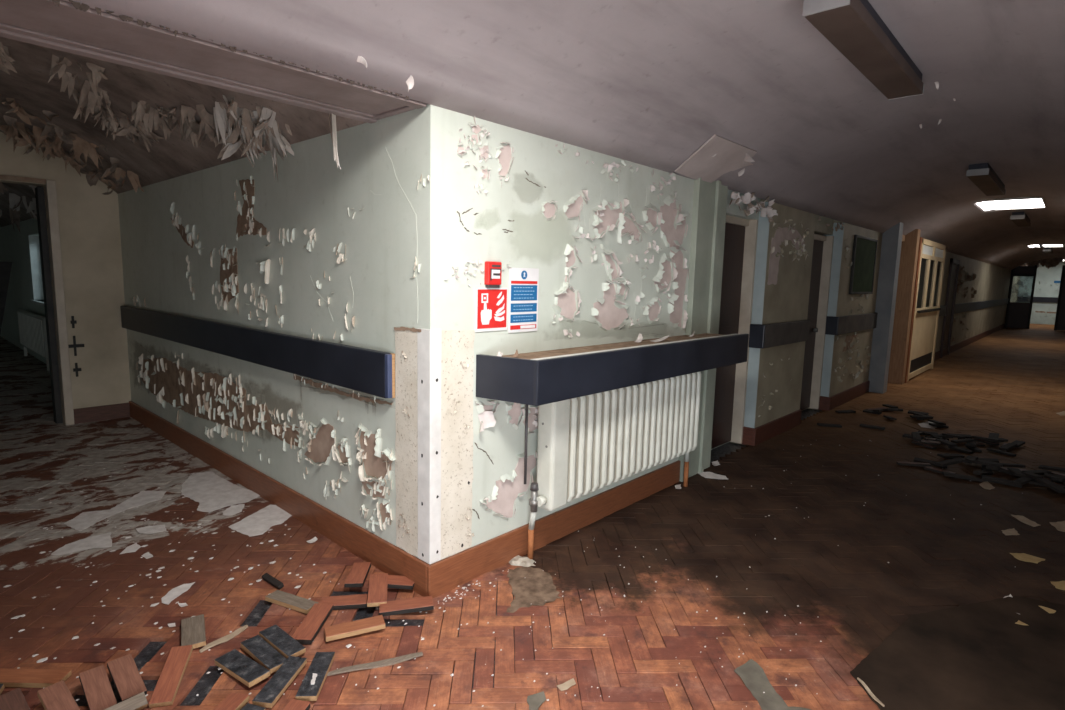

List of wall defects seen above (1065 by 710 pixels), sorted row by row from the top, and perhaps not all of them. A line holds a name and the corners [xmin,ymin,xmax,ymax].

peeling [457,116,515,196]
peeling [170,175,316,328]
peeling [333,243,347,264]
peeling [541,134,757,342]
peeling [333,302,355,341]
flaking render [136,327,539,564]
peeling [120,524,166,559]